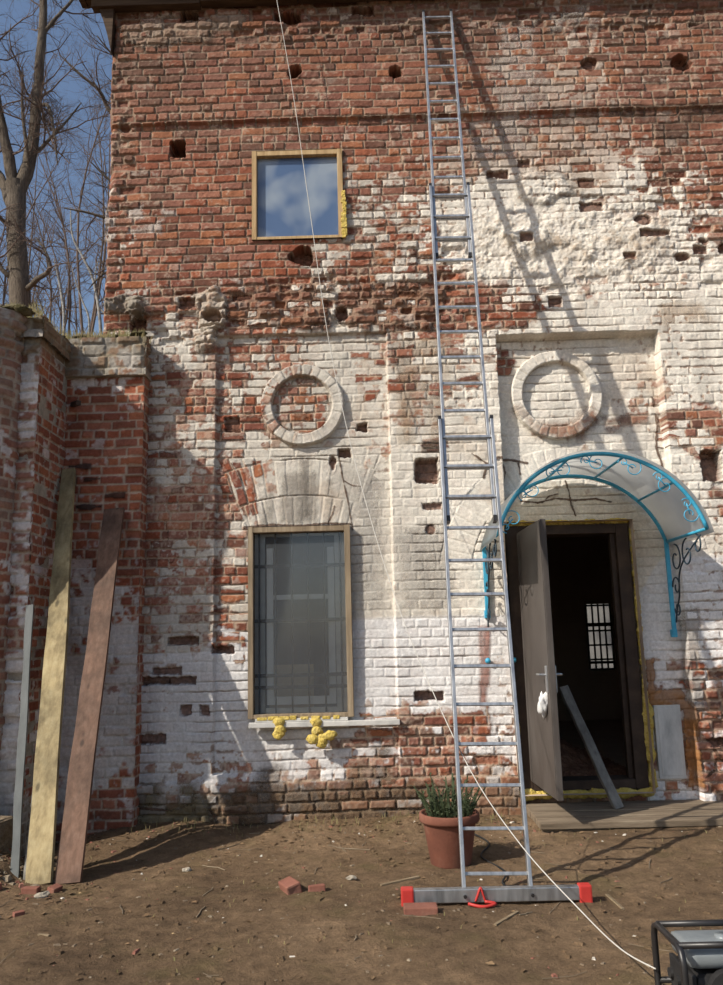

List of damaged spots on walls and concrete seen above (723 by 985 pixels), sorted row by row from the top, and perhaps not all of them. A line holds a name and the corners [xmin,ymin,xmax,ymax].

spalling [486,170,507,179]
spalling [578,180,594,188]
spalling [635,216,671,237]
spalling [674,237,723,262]
crack [473,454,528,479]
peeling [513,403,723,521]
peeling [216,461,263,523]
crack [520,480,612,516]
peeling [211,534,248,663]
spalling [168,636,199,646]
spalling [135,733,166,745]
peeling [678,661,723,793]